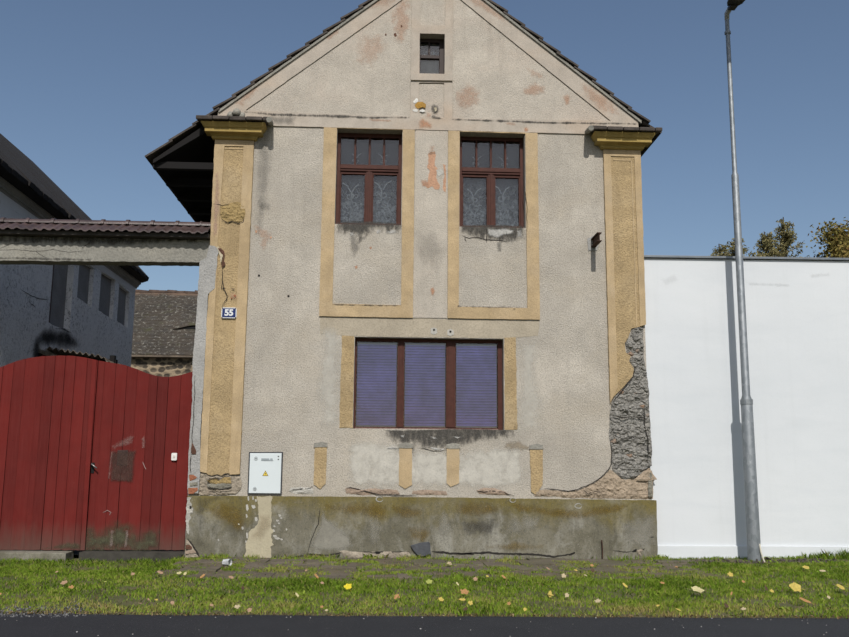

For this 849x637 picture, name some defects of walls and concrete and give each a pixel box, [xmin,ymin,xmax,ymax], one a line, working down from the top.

peeling [422,152,446,192]
water stain [339,221,400,235]
water stain [462,225,522,240]
flaking render [534,326,657,499]
water stain [388,429,509,450]
flaking render [185,443,242,558]
crack [293,511,411,558]
crack [432,550,575,558]